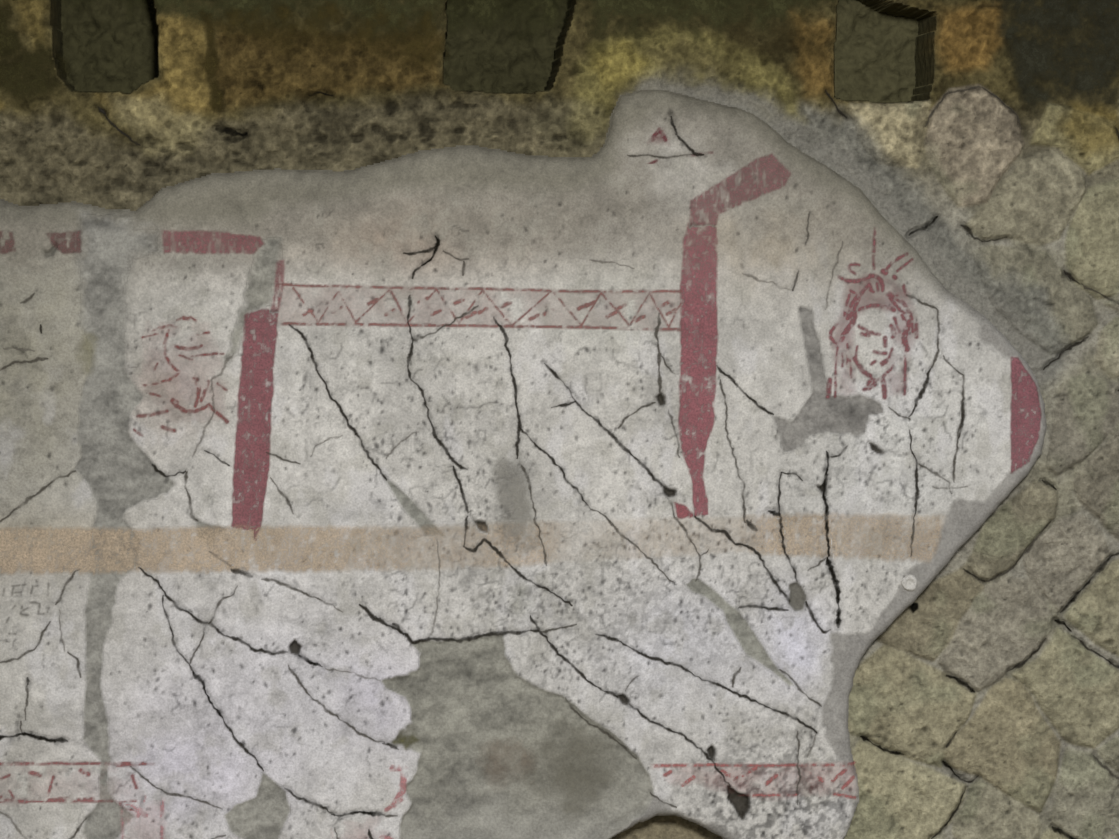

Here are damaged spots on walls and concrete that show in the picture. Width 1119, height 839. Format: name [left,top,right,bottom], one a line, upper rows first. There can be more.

crack [909,216,1002,242]
crack [2,293,48,369]
crack [889,300,965,555]
crack [0,471,76,522]
crack [138,235,847,804]
crack [0,571,81,742]
spalling [614,693,632,708]
crack [946,675,975,693]
crack [860,736,904,755]
crack [132,768,219,808]
crack [931,732,979,839]
crack [287,789,397,839]